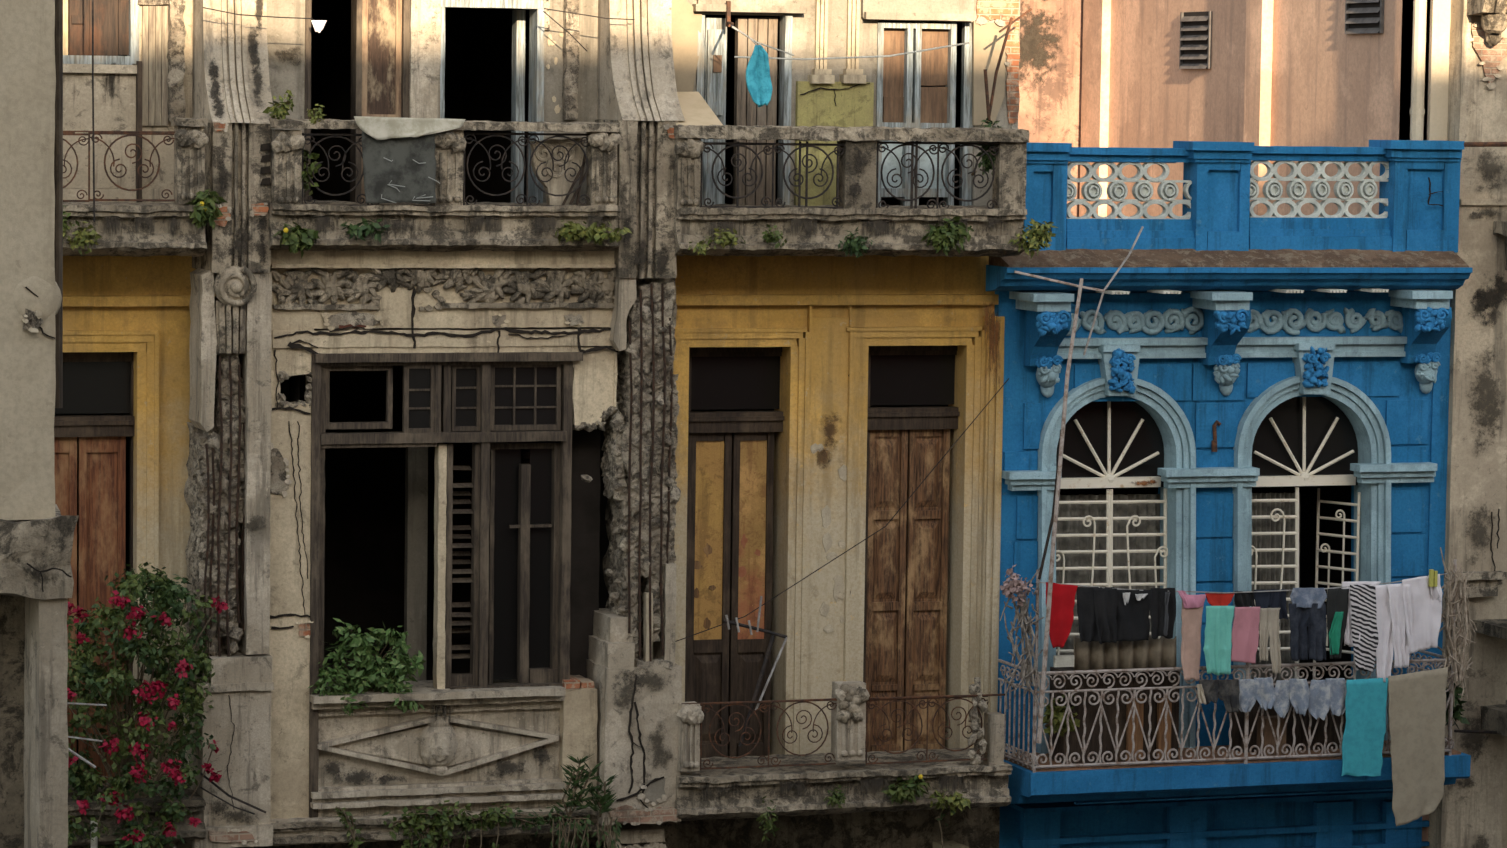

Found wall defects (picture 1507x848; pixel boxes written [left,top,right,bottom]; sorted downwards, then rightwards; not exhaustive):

spalling [975,0,1020,129]
spalling [275,371,312,408]
spalling [573,279,681,661]
leakage [817,416,838,468]
leakage [1468,348,1504,454]
leakage [1466,507,1492,563]
crack [616,675,664,808]